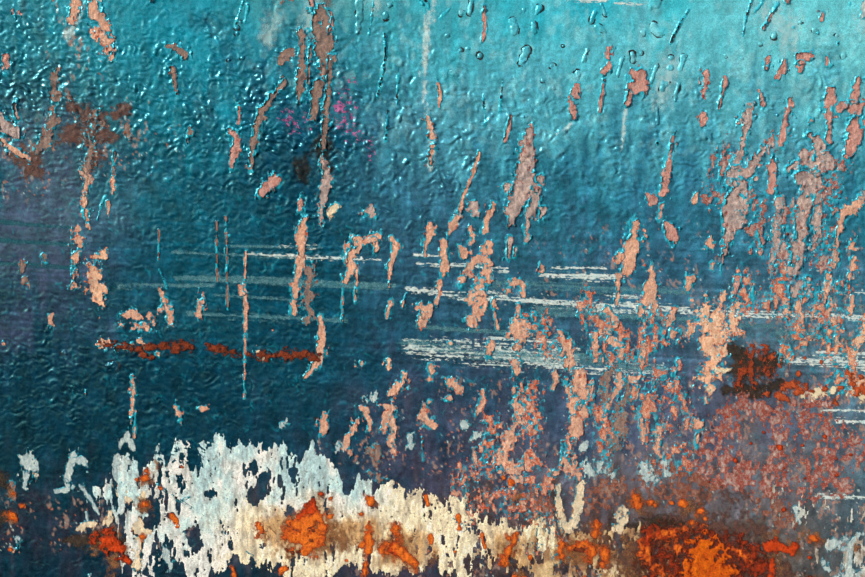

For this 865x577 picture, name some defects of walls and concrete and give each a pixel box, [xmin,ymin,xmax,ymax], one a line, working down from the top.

peeling [66,106,115,318]
peeling [224,0,341,383]
peeling [412,113,549,332]
peeling [95,286,179,355]
peeling [339,228,408,324]
peeling [118,373,139,452]
peeling [335,369,411,459]
rust [720,340,865,406]
rust [0,471,26,525]
rust [253,491,438,577]
rust [554,481,825,577]
peeling [815,505,865,577]